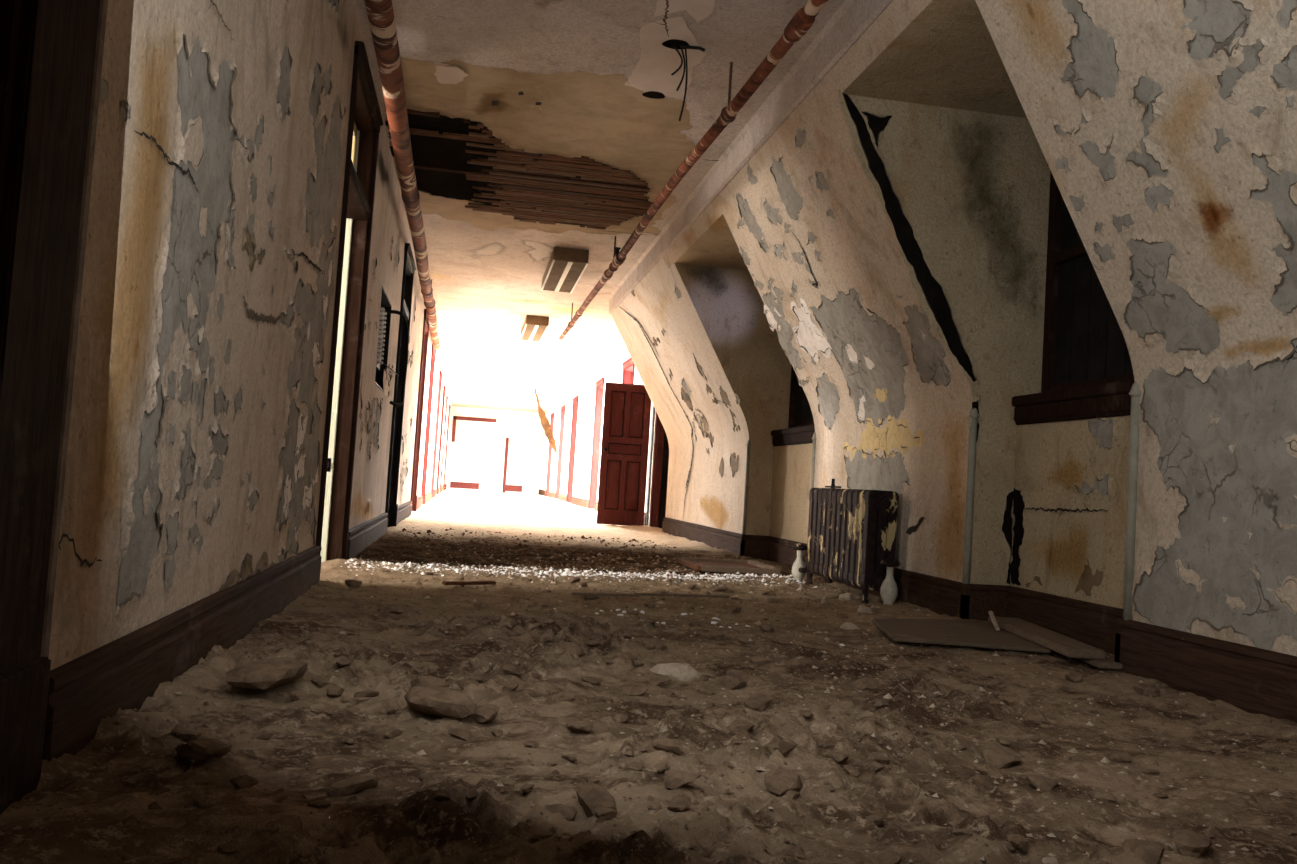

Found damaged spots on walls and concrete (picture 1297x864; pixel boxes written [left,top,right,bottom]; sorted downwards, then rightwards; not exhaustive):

crack [134,130,199,192]
crack [206,0,235,41]
peeling [308,53,332,138]
flaking render [400,56,697,235]
peeling [1050,0,1175,213]
peeling [1175,0,1297,120]
peeling [116,15,293,620]
peeling [735,90,983,496]
peeling [668,354,740,478]
peeling [1069,126,1297,650]
crack [58,533,102,568]
flaking render [999,486,1045,588]